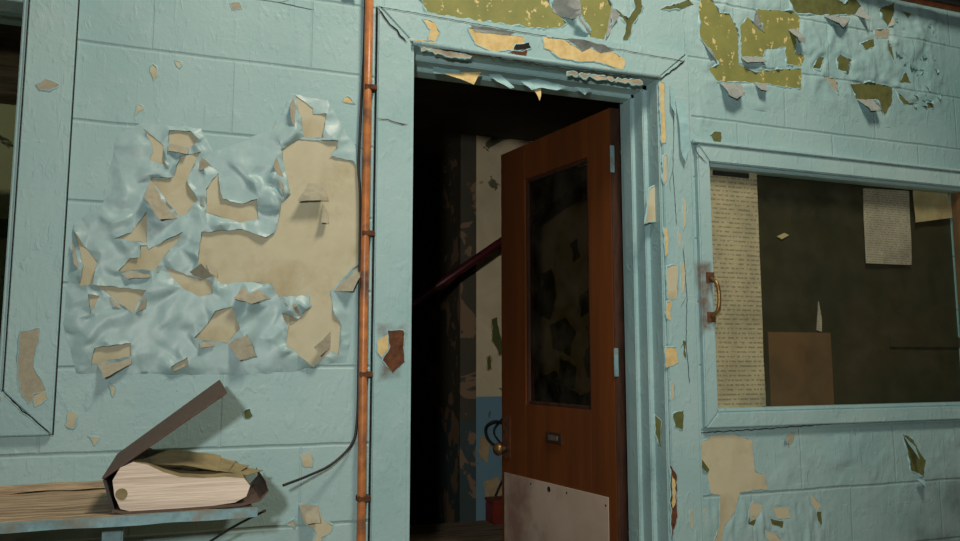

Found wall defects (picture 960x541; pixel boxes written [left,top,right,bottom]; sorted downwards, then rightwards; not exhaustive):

peeling [408,0,644,101]
peeling [660,0,943,115]
peeling [644,81,689,321]
peeling [535,269,590,406]
peeling [285,503,334,541]
peeling [701,433,791,541]
spalling [902,434,926,487]